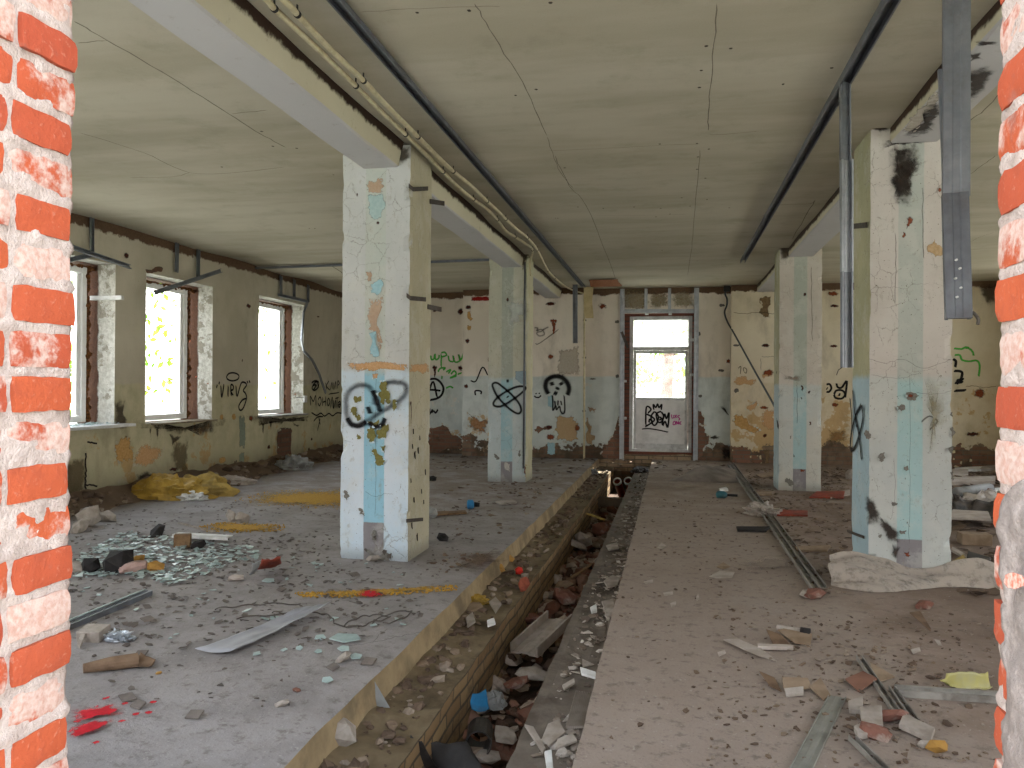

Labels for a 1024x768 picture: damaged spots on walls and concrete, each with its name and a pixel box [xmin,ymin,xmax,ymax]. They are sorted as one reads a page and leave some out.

crack [475,5,708,276]
damp [887,140,920,201]
peeling [367,178,385,219]
peeling [346,272,429,412]
peeling [114,436,161,467]
flaking render [412,425,462,459]
peeling [467,412,488,433]
flaking render [732,446,770,463]
peeling [733,401,774,434]
damp [881,518,899,558]